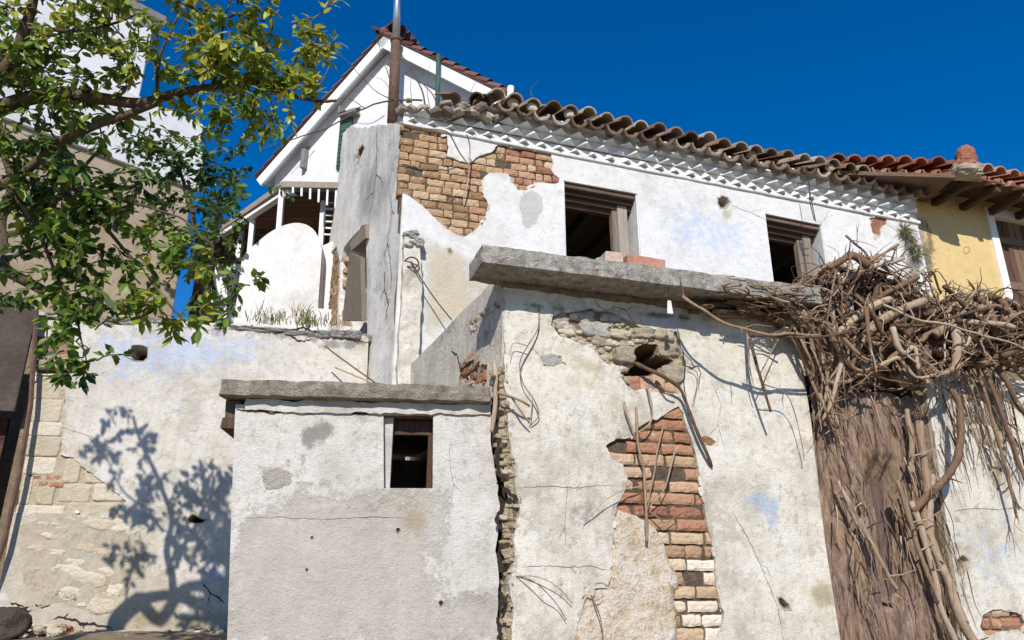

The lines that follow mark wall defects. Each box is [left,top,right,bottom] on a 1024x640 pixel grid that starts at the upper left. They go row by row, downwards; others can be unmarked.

flaking render [395,98,559,238]
spalling [716,195,731,209]
crack [362,135,394,321]
spalling [869,216,886,235]
flaking render [459,351,487,386]
spalling [540,349,566,366]
flaking render [15,336,126,514]
water stain [302,422,332,447]
flaking render [551,310,722,640]
flaking render [980,609,1024,636]